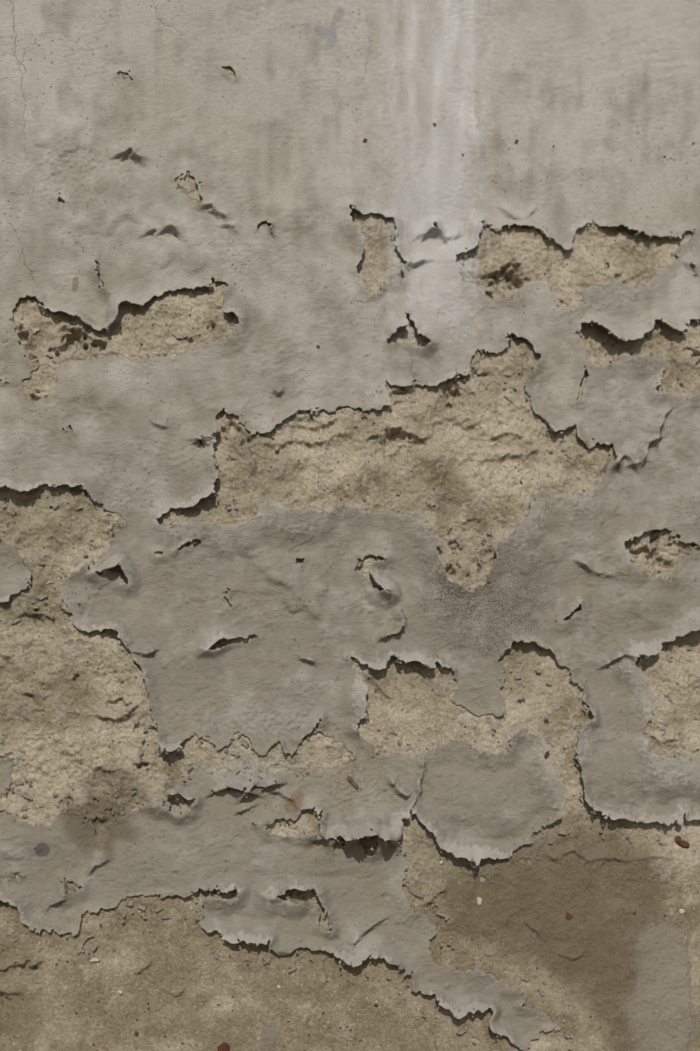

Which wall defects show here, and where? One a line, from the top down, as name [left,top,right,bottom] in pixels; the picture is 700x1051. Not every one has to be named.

spalling [0,254,253,402]
peeling [135,172,277,245]
spalling [144,198,700,592]
spalling [0,473,700,1051]